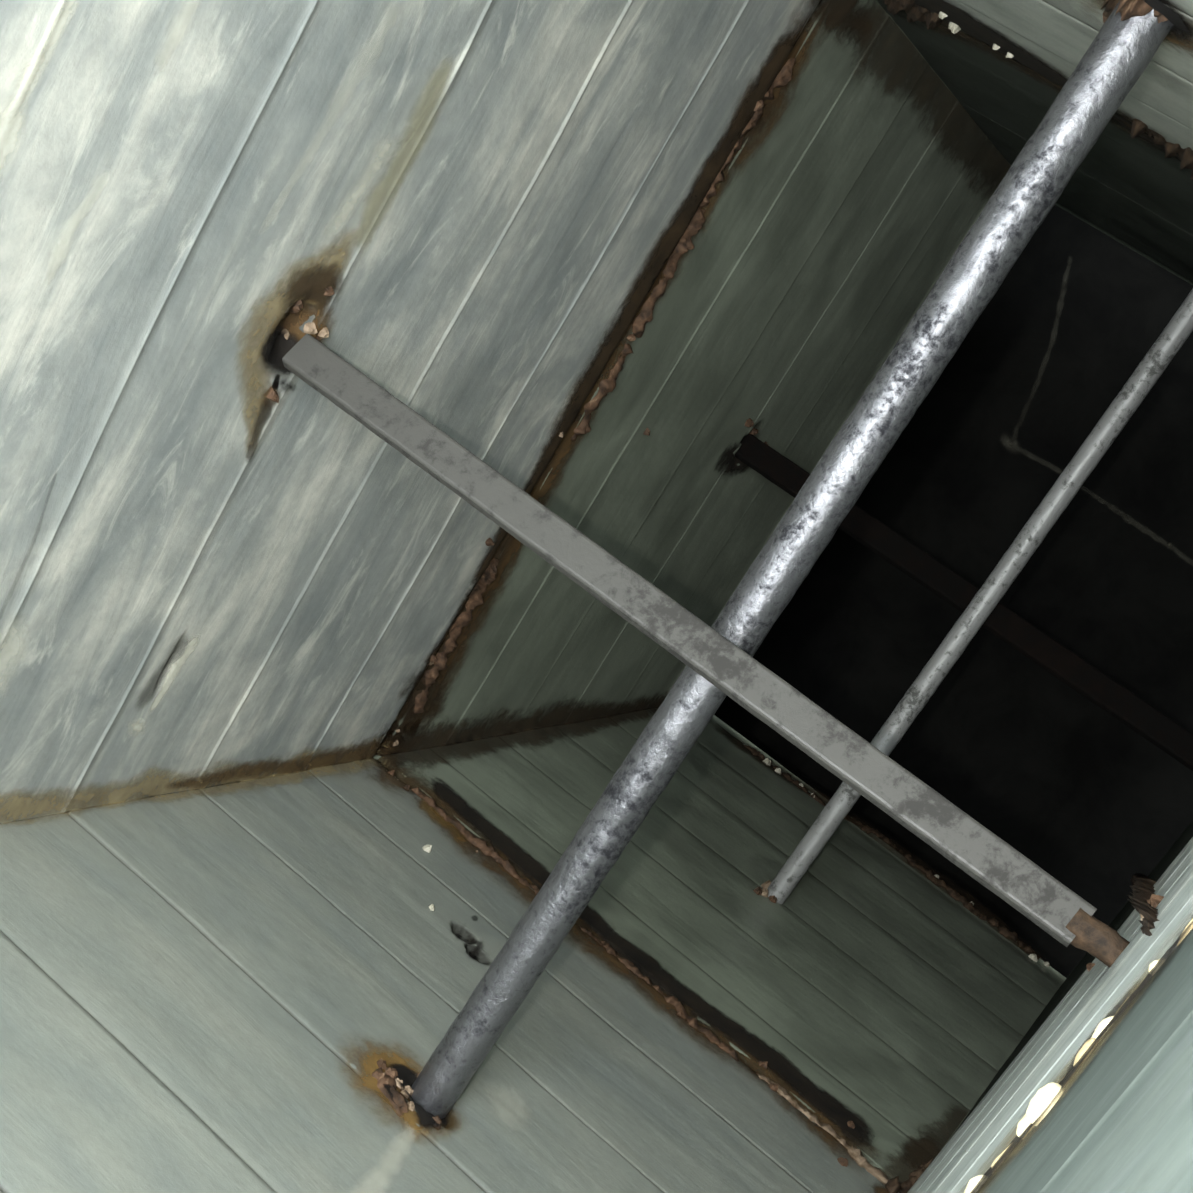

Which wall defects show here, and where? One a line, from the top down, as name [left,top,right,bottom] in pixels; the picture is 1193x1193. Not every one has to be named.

corrosion [530,0,1068,506]
corrosion [1111,111,1193,181]
corrosion [0,538,667,902]
spalling [1127,873,1164,936]
corrosion [569,918,967,1193]